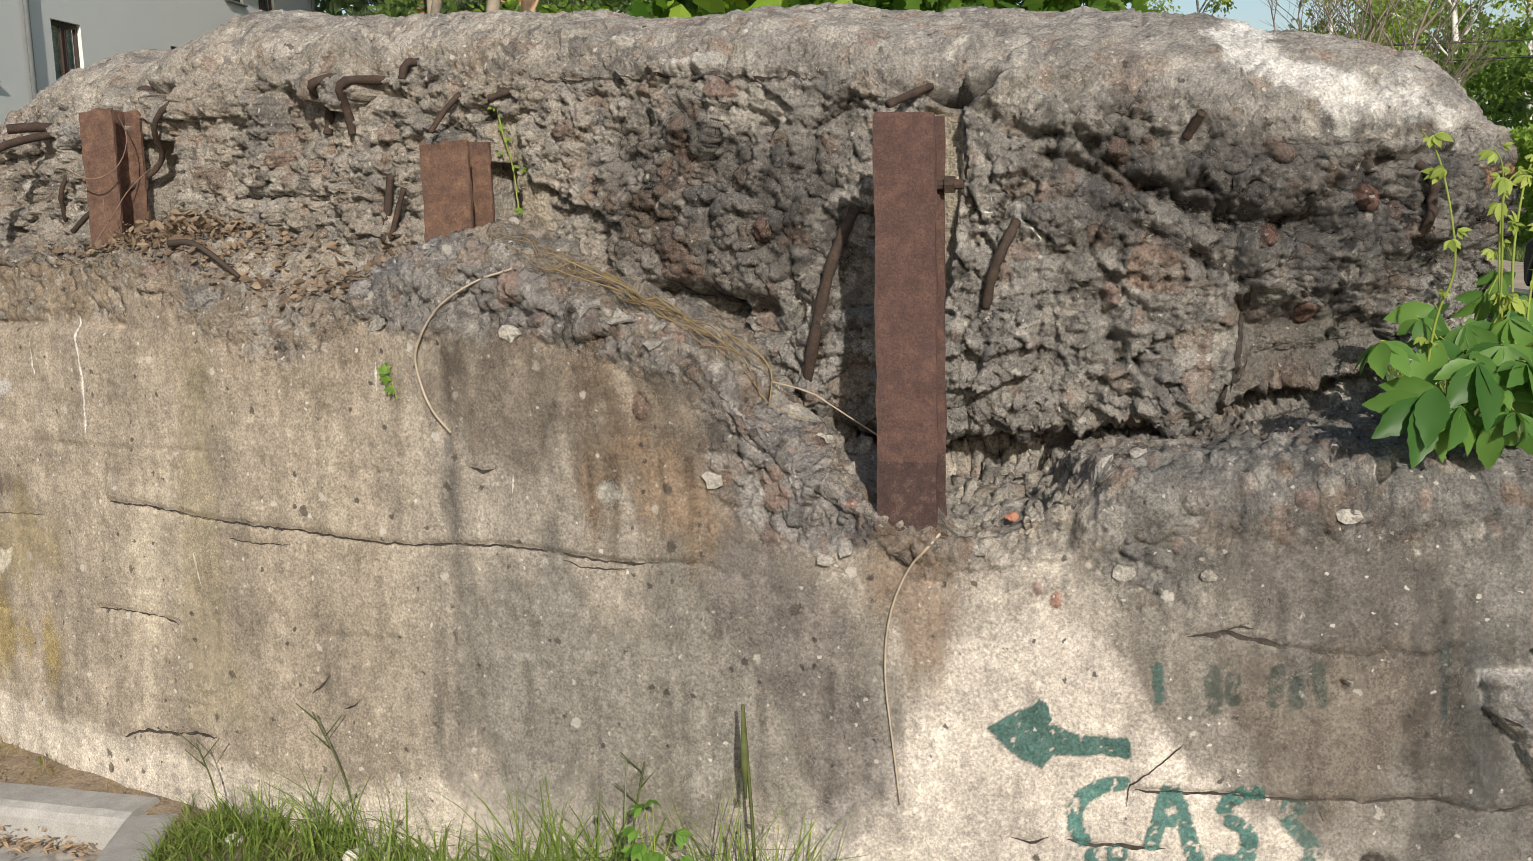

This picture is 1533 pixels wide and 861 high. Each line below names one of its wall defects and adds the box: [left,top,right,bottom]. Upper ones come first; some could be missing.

spalling [930,75,999,109]
spalling [0,253,126,323]
damp [422,315,620,492]
spalling [346,230,880,566]
damp [637,360,728,454]
damp [441,433,462,536]
peeling [0,547,12,575]
crack [110,501,718,570]
crack [1187,625,1323,654]
damp [433,521,902,860]
crack [1126,745,1530,822]
crack [1011,837,1166,850]